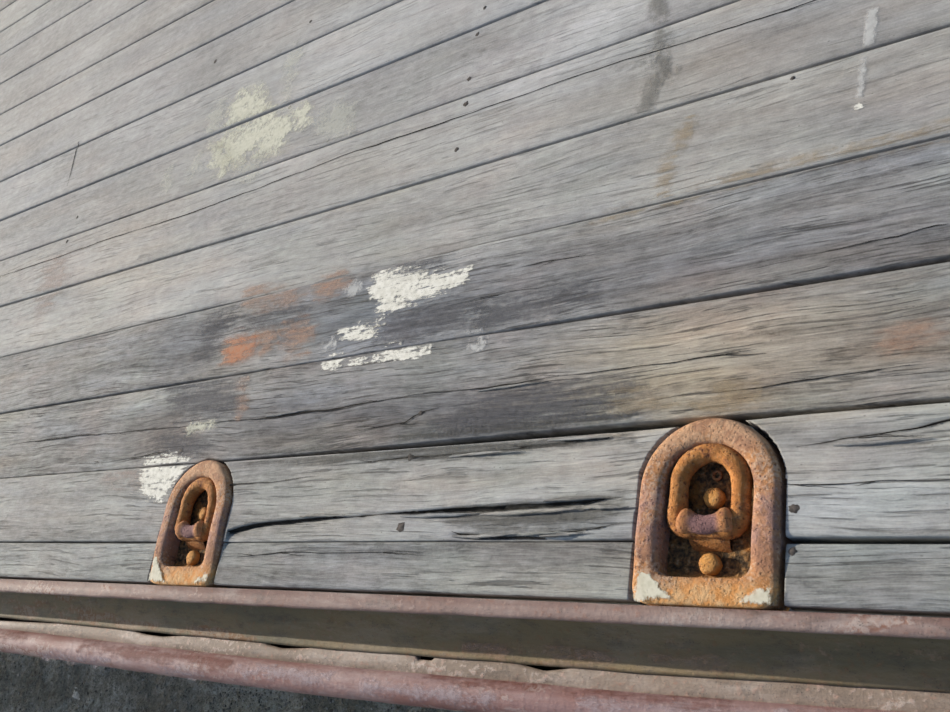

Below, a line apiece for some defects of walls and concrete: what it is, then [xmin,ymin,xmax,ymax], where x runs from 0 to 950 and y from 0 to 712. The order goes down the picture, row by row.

rust [222,330,273,363]
crack [7,349,767,465]
crack [228,496,629,557]